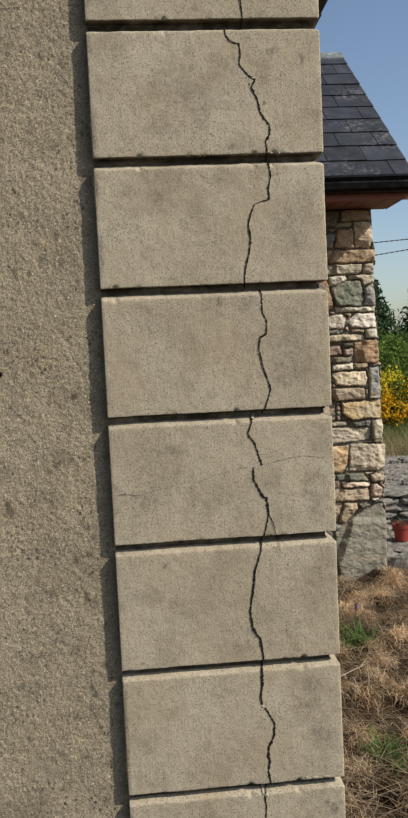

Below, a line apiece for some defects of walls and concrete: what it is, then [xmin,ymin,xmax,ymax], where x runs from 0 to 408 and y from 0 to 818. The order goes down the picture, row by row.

crack [121,0,321,818]